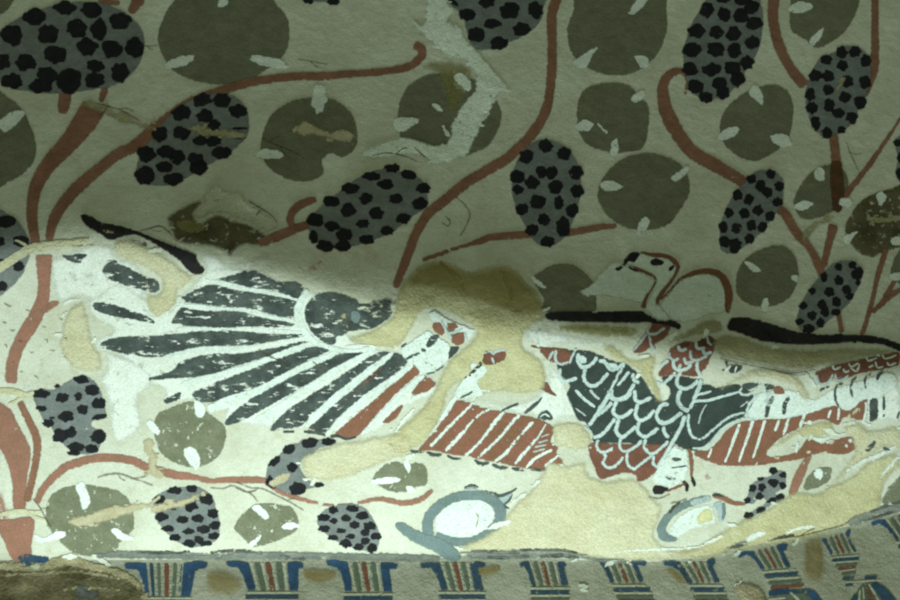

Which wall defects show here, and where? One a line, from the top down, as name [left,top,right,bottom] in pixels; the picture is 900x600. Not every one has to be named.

peeling [363,0,507,167]
flaking render [194,185,279,232]
flaking render [0,552,150,600]